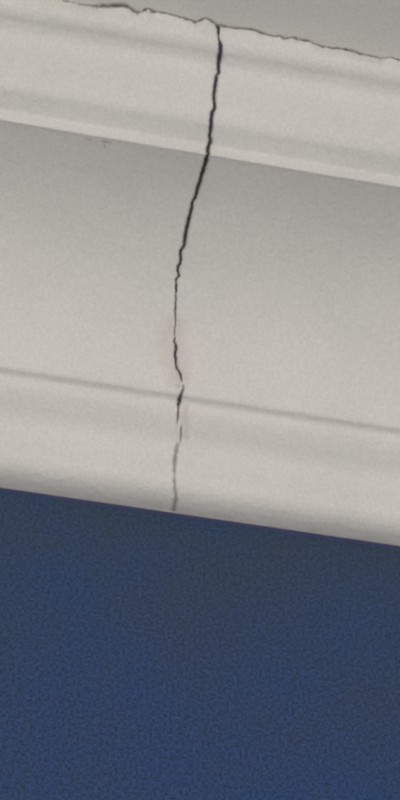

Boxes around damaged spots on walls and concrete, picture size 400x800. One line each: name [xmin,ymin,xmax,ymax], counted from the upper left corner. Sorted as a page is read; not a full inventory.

crack [62,0,400,513]